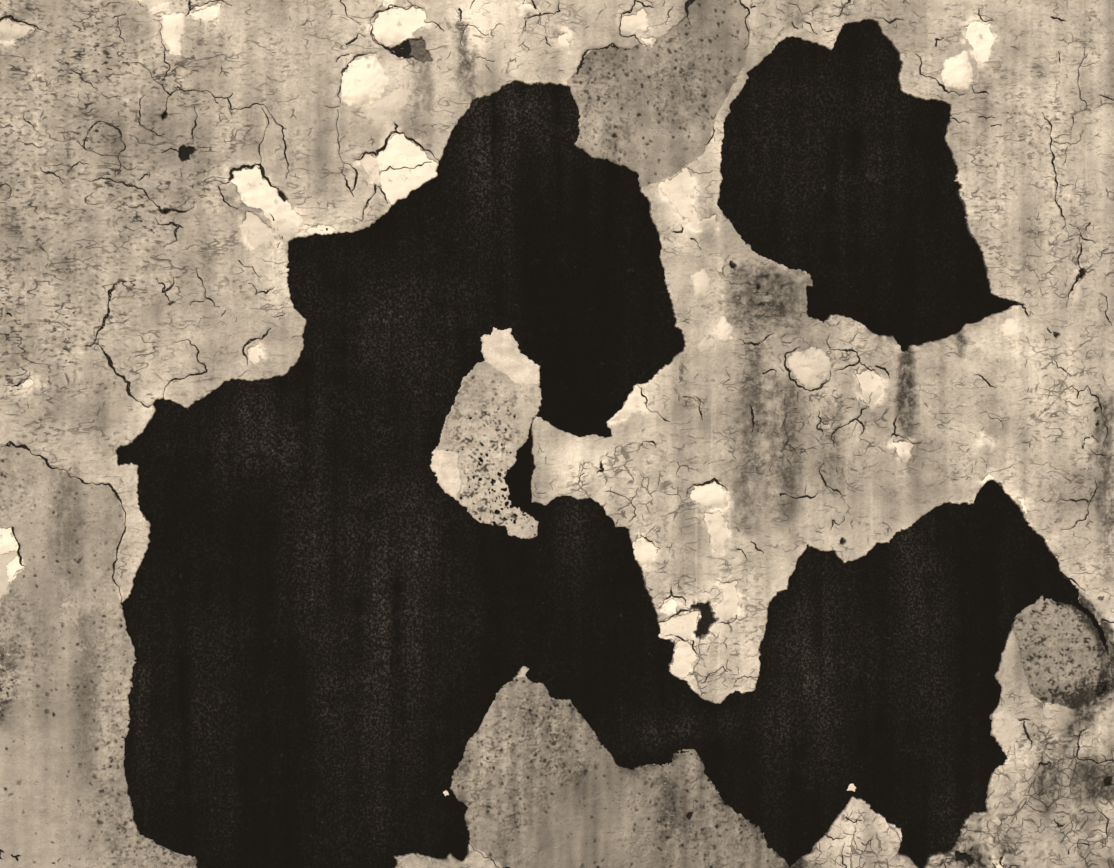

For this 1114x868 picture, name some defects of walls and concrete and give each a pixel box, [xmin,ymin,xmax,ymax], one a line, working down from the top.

crack [40,0,289,246]
peeling [359,134,437,204]
crack [326,0,494,221]
peeling [567,0,750,234]
spalling [717,20,1023,352]
crack [1042,47,1114,303]
crack [85,281,208,408]
crack [739,333,890,528]
peeling [0,445,197,868]
crack [658,587,757,683]
peeling [1011,596,1111,709]
peeling [450,674,789,868]